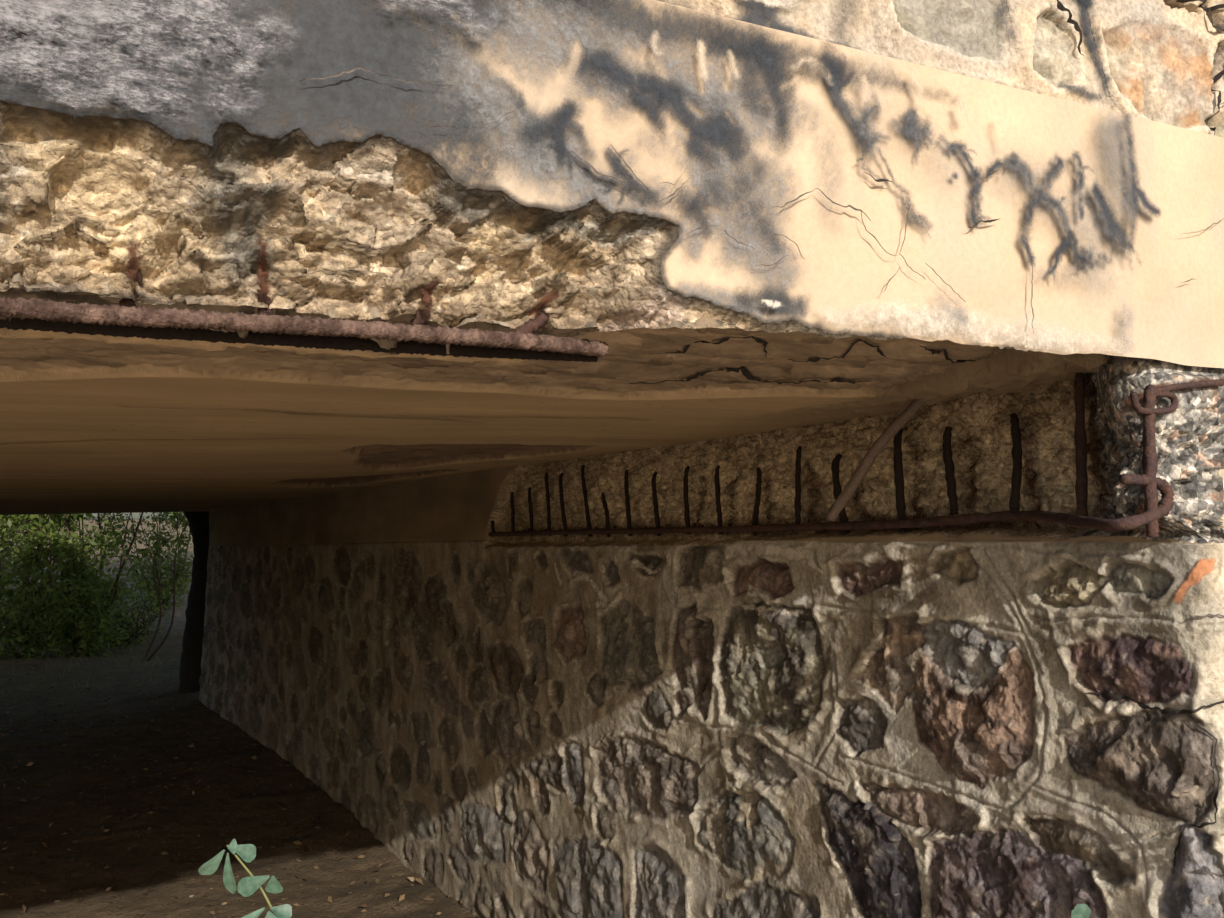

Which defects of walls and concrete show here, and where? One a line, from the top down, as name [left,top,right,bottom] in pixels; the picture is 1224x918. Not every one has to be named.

spalling [1163,0,1224,55]
crack [1176,0,1224,31]
peeling [698,41,708,79]
crack [1206,70,1224,134]
corrosion [255,237,270,294]
crack [685,188,965,301]
corrosion [422,279,442,311]
corrosion [529,290,559,316]
spalling [0,100,1224,548]
crack [629,336,886,384]
corrosion [523,423,1076,535]
crack [1083,692,1224,874]